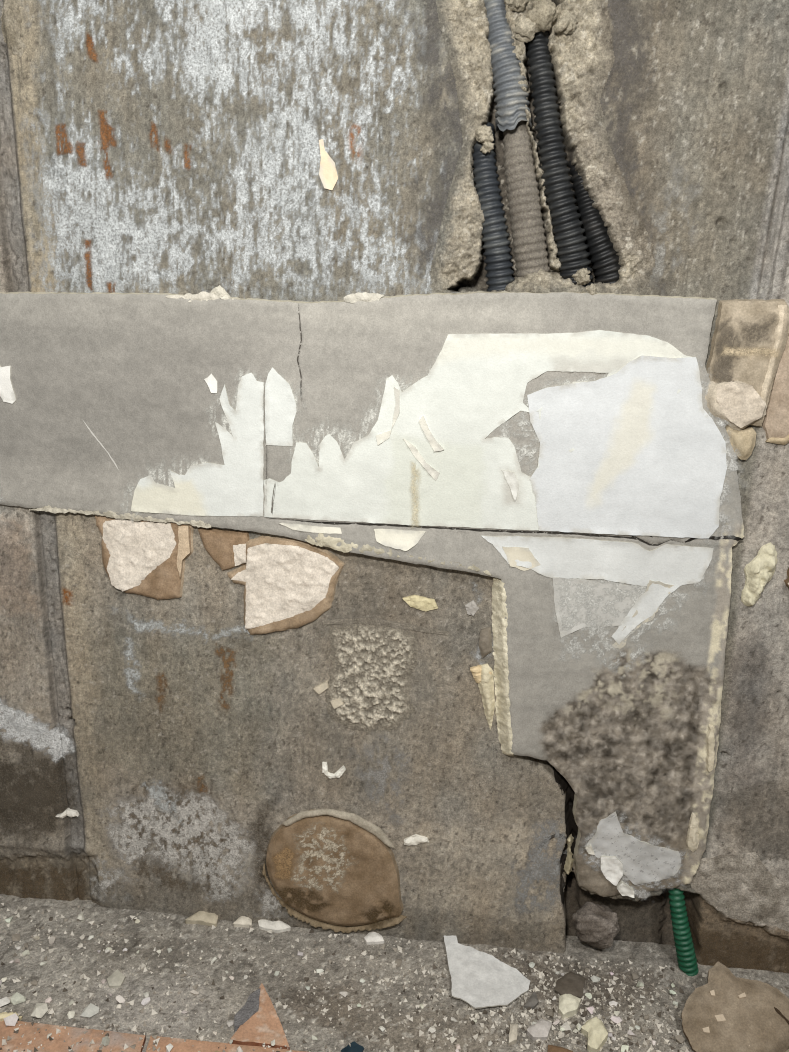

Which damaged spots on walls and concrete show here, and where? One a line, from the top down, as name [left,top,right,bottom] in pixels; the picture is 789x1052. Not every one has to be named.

corrosion [86,34,97,61]
corrosion [55,124,87,166]
corrosion [99,111,116,179]
corrosion [150,124,170,151]
damp [33,0,463,298]
spalling [429,0,660,295]
corrosion [84,240,92,290]
crack [295,305,303,395]
peeling [29,330,738,756]
damp [0,699,75,841]
crack [538,766,578,906]